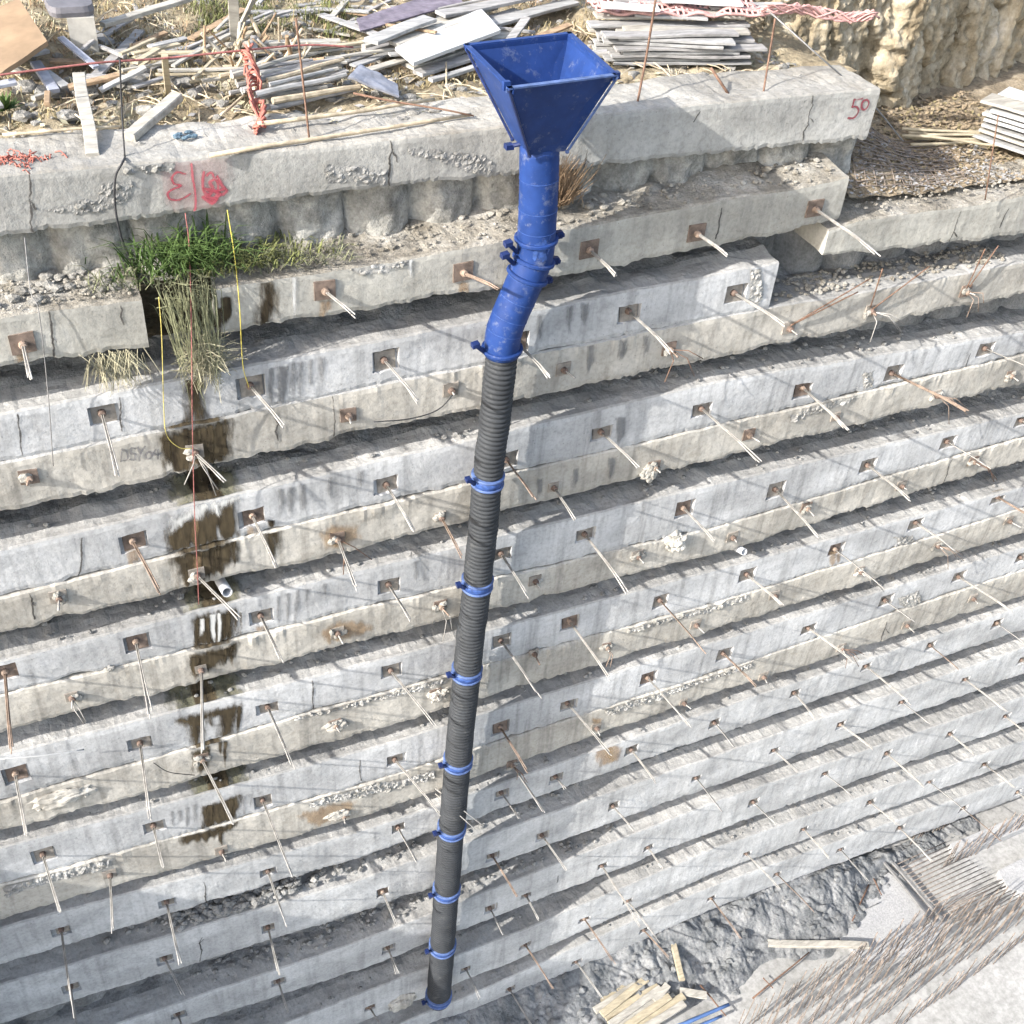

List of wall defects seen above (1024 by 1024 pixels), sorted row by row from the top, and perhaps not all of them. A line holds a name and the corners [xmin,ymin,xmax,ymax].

water stain [160,377,233,473]
water stain [165,498,240,587]
water stain [190,609,242,678]
water stain [177,705,242,772]
water stain [172,795,245,845]
spalling [308,770,436,808]